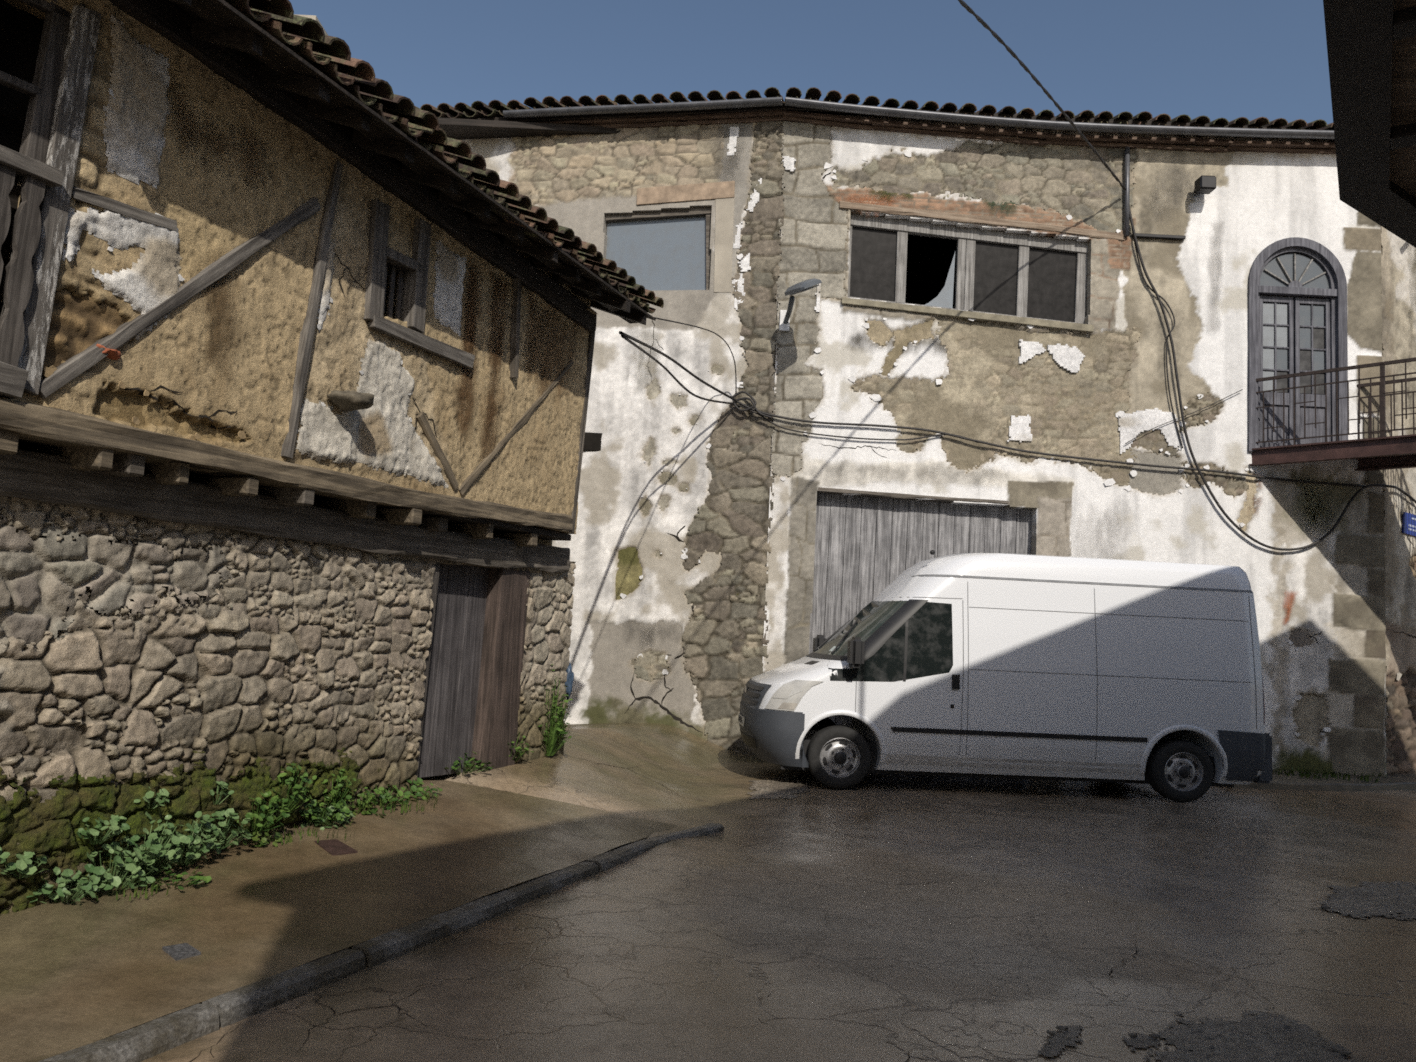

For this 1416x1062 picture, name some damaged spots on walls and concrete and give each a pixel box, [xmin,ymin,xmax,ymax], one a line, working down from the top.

peeling [41,207,185,378]
peeling [631,116,1138,754]
peeling [848,316,1258,532]
peeling [615,547,662,600]
spalling [1385,670,1416,776]
spalling [1122,1009,1366,1062]